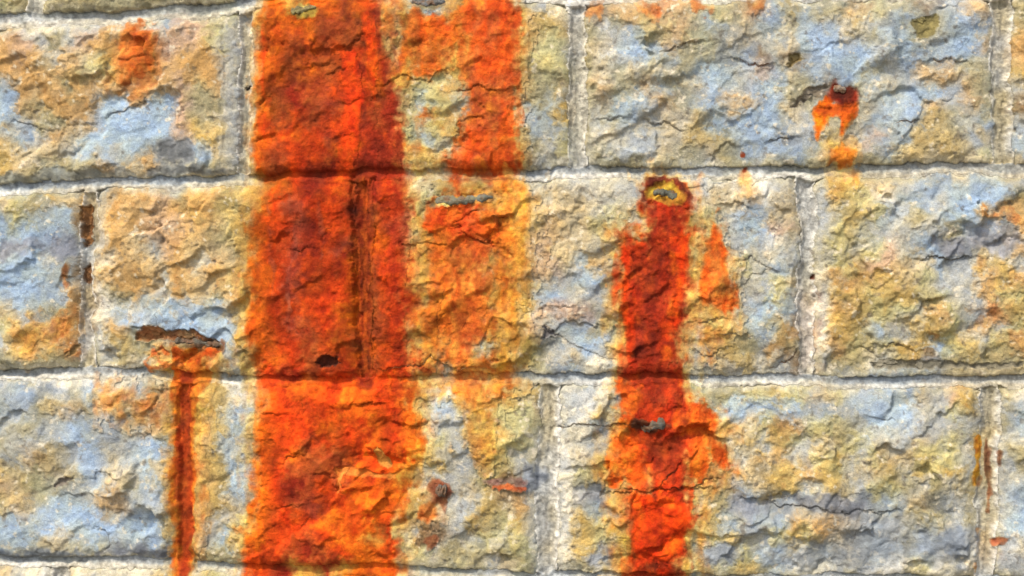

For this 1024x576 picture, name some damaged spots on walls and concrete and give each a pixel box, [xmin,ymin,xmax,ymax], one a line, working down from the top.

rust [91,0,556,576]
rust [584,156,750,576]
rust [811,77,871,202]
rust [971,434,1004,514]